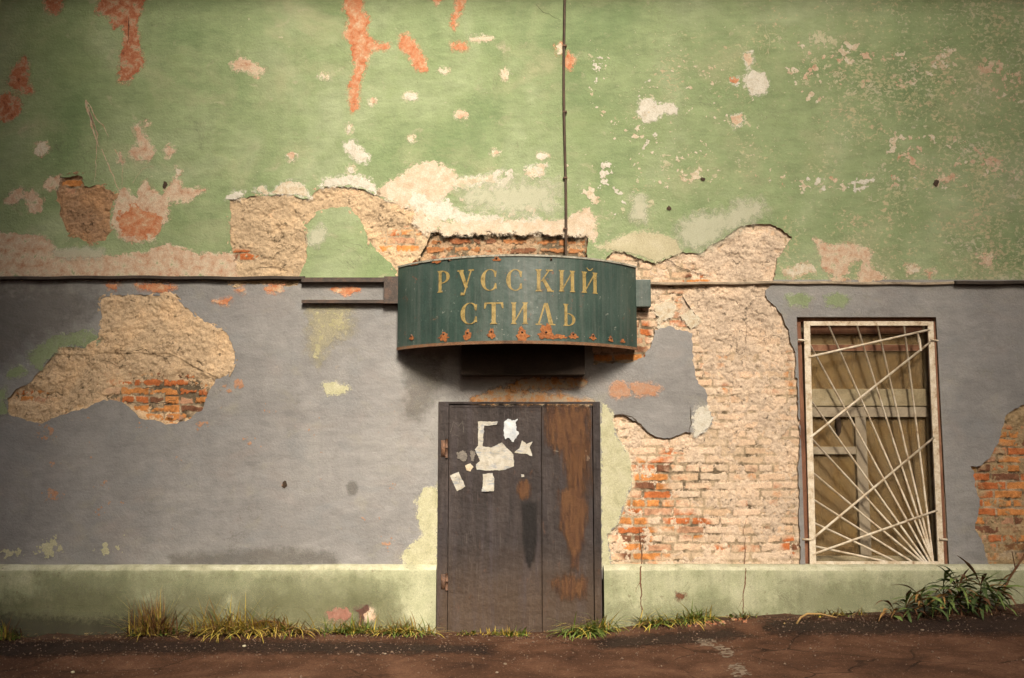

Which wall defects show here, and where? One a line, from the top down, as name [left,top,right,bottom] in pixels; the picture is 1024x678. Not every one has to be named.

peeling [94,0,145,82]
peeling [343,0,449,112]
peeling [451,0,493,51]
spalling [0,40,719,440]
spalling [592,224,886,565]
spalling [326,605,375,628]
flaking render [402,487,438,565]
crack [635,530,643,622]
crack [738,523,746,614]
spalling [971,405,1024,564]